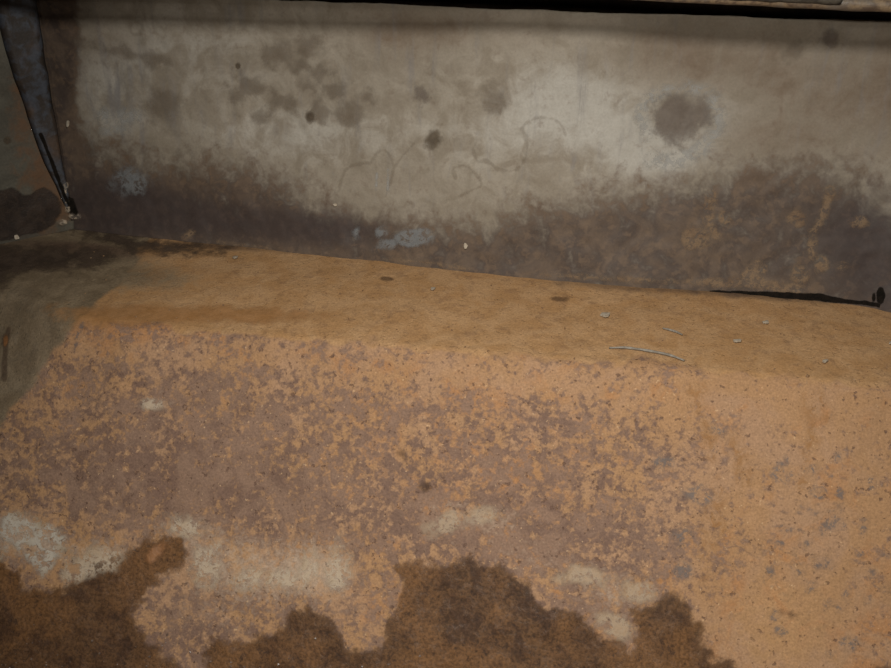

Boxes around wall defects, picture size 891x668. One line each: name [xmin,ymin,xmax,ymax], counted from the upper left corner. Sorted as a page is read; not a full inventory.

water stain [0,188,228,289]
water stain [0,512,221,668]
water stain [204,558,733,668]